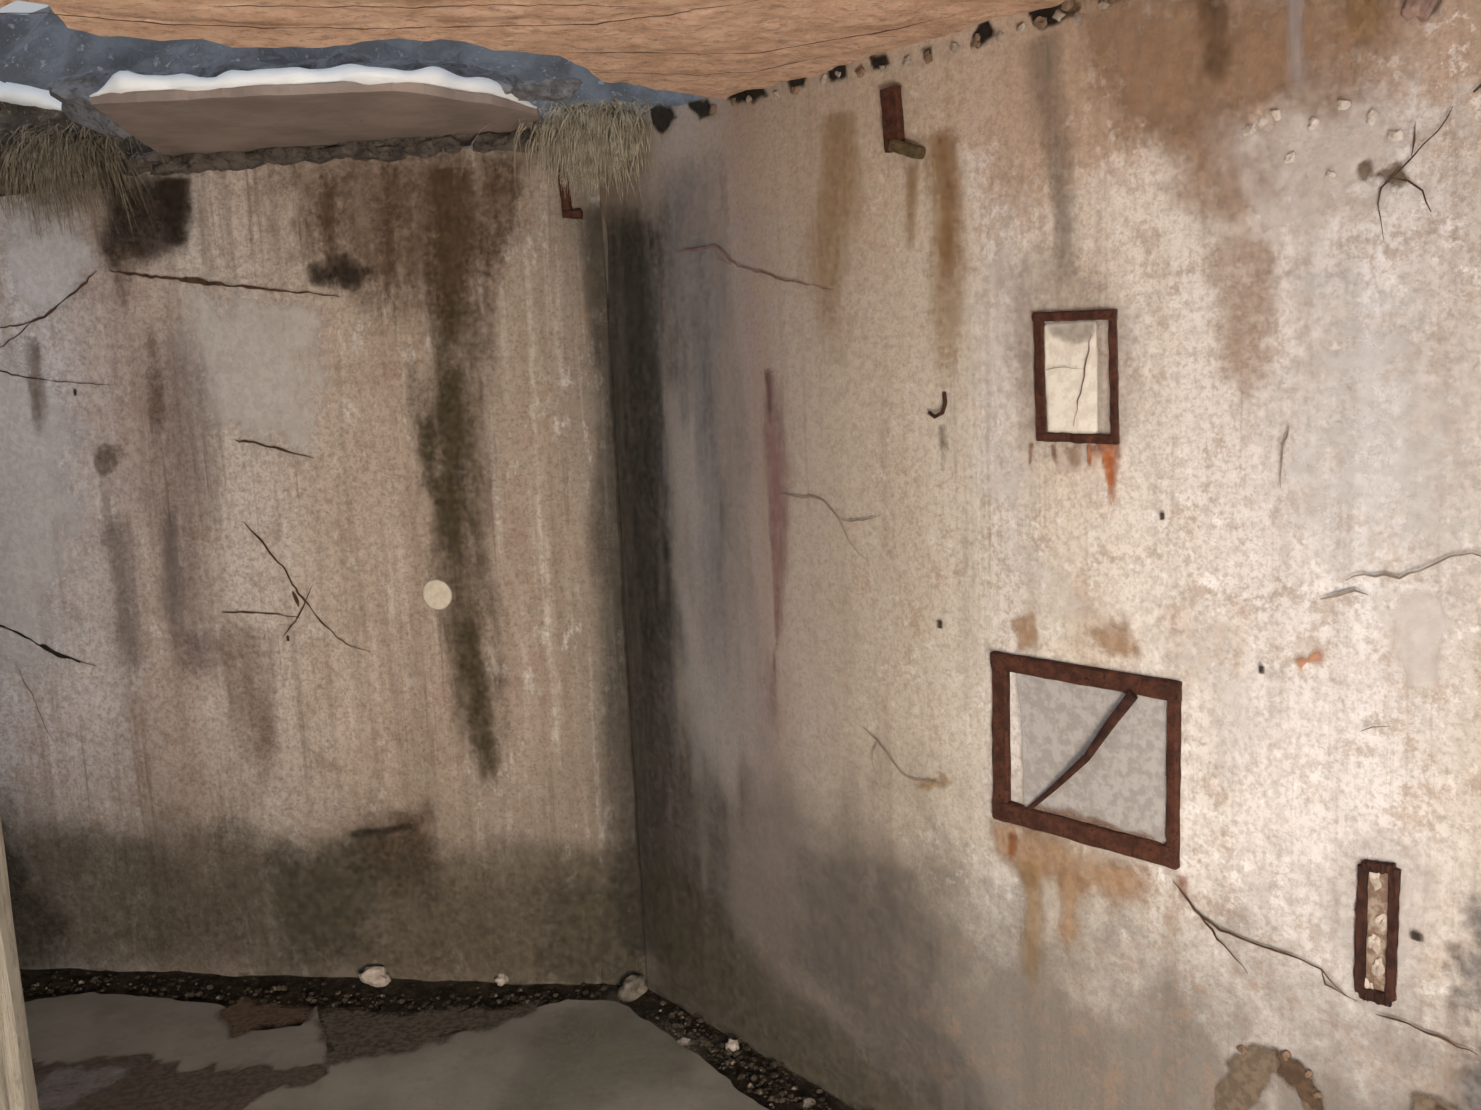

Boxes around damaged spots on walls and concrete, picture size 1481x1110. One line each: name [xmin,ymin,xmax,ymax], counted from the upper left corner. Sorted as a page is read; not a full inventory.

water stain [6,177,189,315]
water stain [306,161,515,292]
rust [933,137,958,281]
crack [1377,84,1481,240]
crack [0,270,339,385]
rust [1052,444,1118,494]
crack [222,522,370,652]
water stain [588,212,698,950]
crack [0,625,97,756]
rust [994,824,1145,955]
crack [1172,881,1478,1055]
spalling [1215,1045,1324,1110]